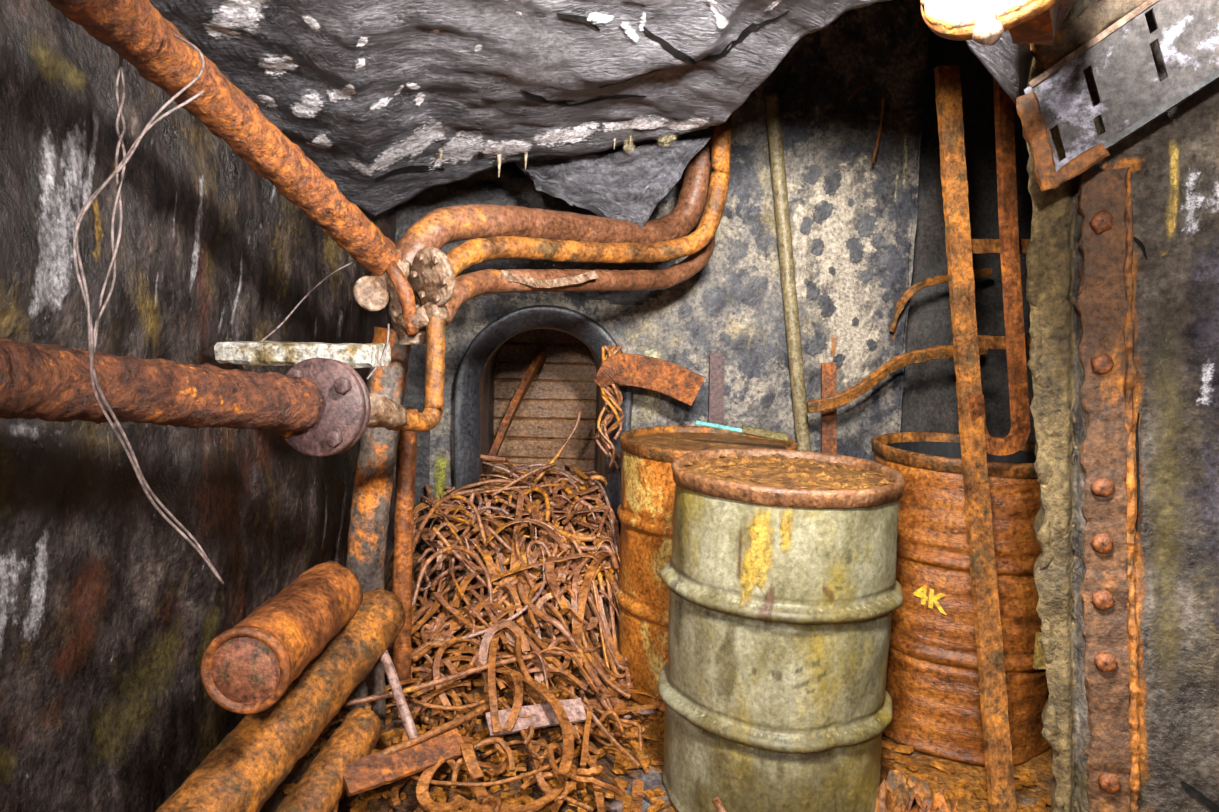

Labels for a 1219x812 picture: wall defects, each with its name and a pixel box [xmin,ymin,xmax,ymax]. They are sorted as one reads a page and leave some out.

leakage [203,0,270,39]
efflorescence [258,54,299,77]
leakage [302,14,321,31]
leakage [355,36,368,69]
crack [519,10,790,106]
rust [1103,158,1138,172]
efflorescence [30,117,98,313]
leakage [679,263,726,340]
leakage [869,133,911,423]
leakage [760,392,775,407]
rust [1127,373,1143,664]
rust [1137,678,1147,776]